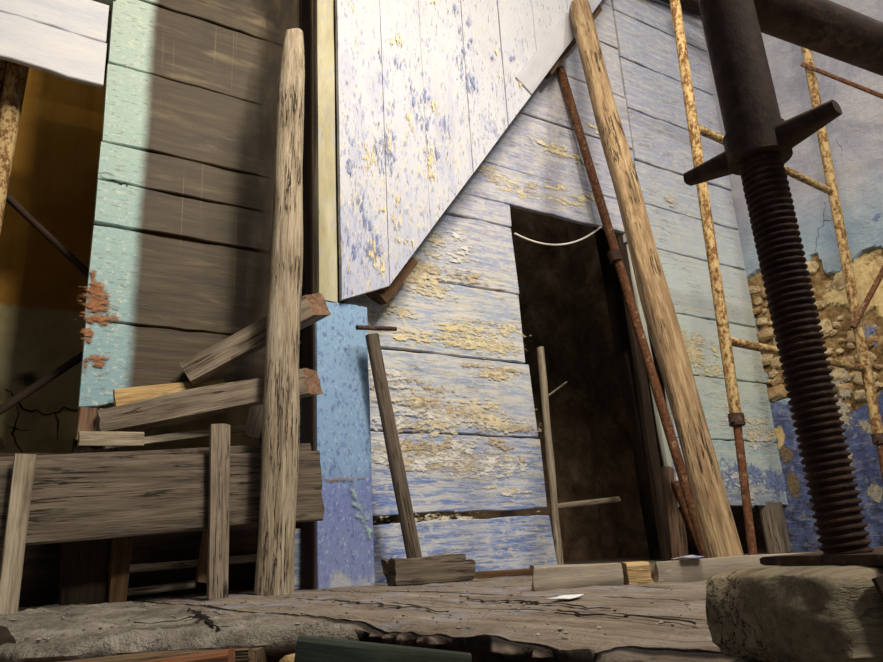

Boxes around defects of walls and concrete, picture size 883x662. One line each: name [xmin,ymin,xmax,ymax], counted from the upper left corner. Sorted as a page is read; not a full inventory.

peeling [453,3,479,92]
peeling [406,85,450,180]
peeling [346,128,399,275]
peeling [475,164,596,209]
peeling [356,190,526,381]
spalling [748,272,788,403]
spalling [806,248,883,435]
crack [5,389,78,453]
peeling [368,368,389,467]
peeling [385,366,542,496]
peeling [415,514,473,522]
peeling [866,481,883,503]